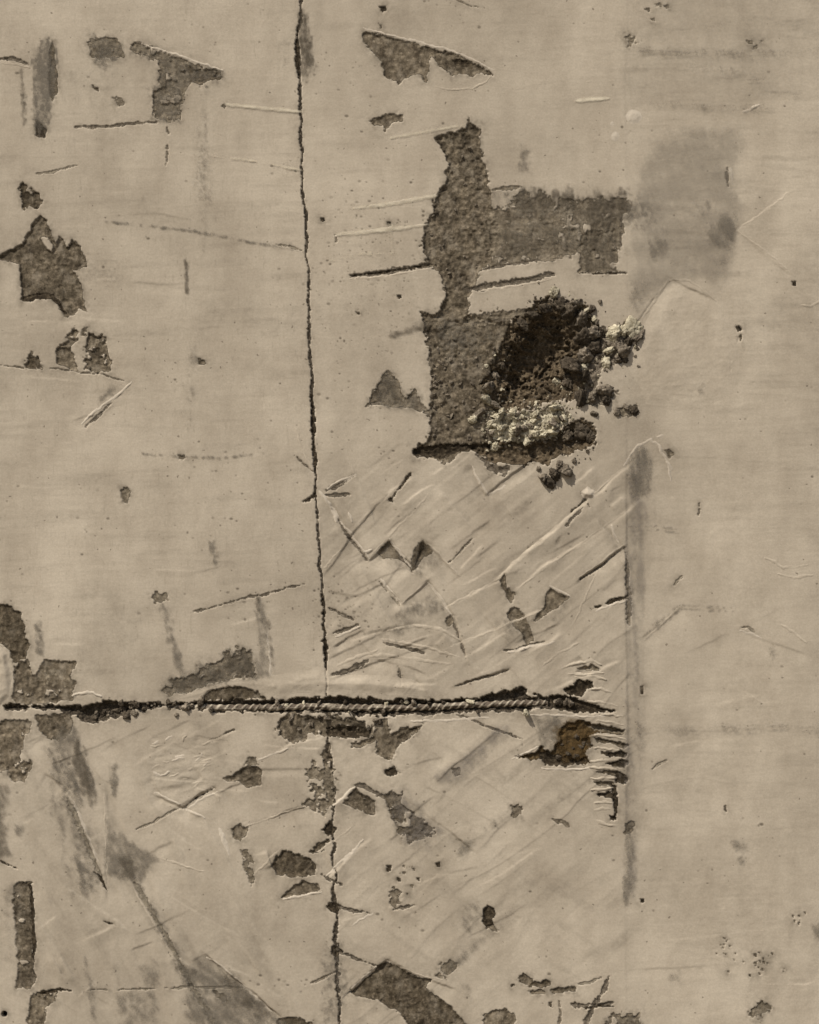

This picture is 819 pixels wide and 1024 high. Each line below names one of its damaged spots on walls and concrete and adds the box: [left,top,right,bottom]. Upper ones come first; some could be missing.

peeling [75,38,224,154]
peeling [363,25,494,91]
spalling [0,183,87,317]
spalling [7,328,119,380]
spalling [349,120,647,490]
crack [4,0,615,1024]
spalling [162,646,256,697]
spalling [0,605,110,889]
spalling [275,710,420,776]
spalling [12,882,71,1024]
spalling [342,955,465,1024]
peeling [475,906,497,931]